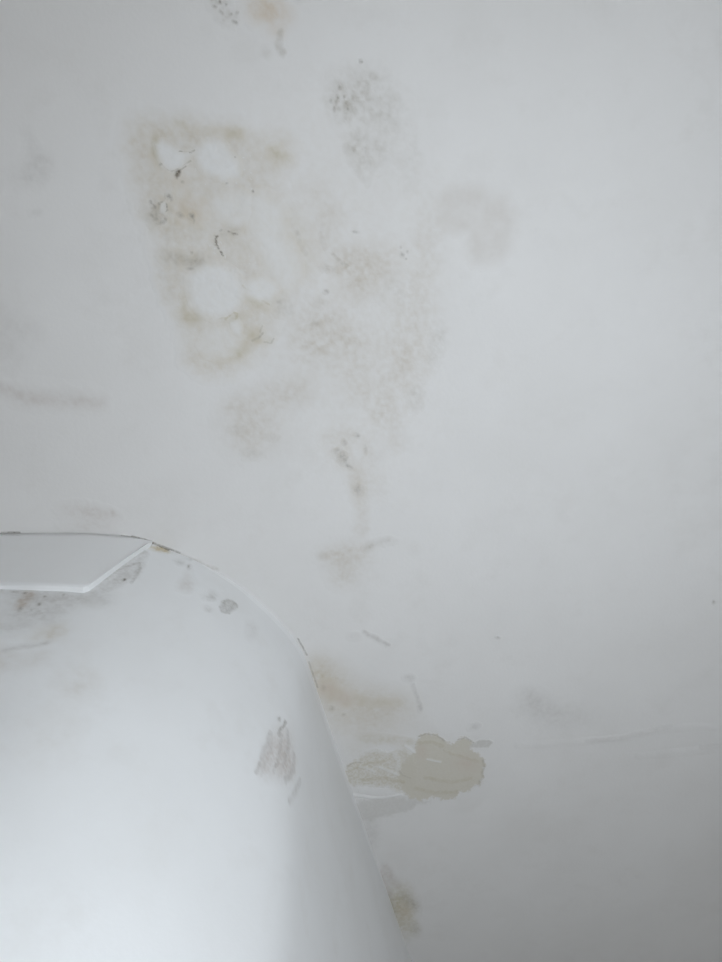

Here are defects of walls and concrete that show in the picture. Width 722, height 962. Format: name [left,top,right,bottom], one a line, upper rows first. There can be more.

damp [186,42,522,597]
peeling [337,730,494,824]